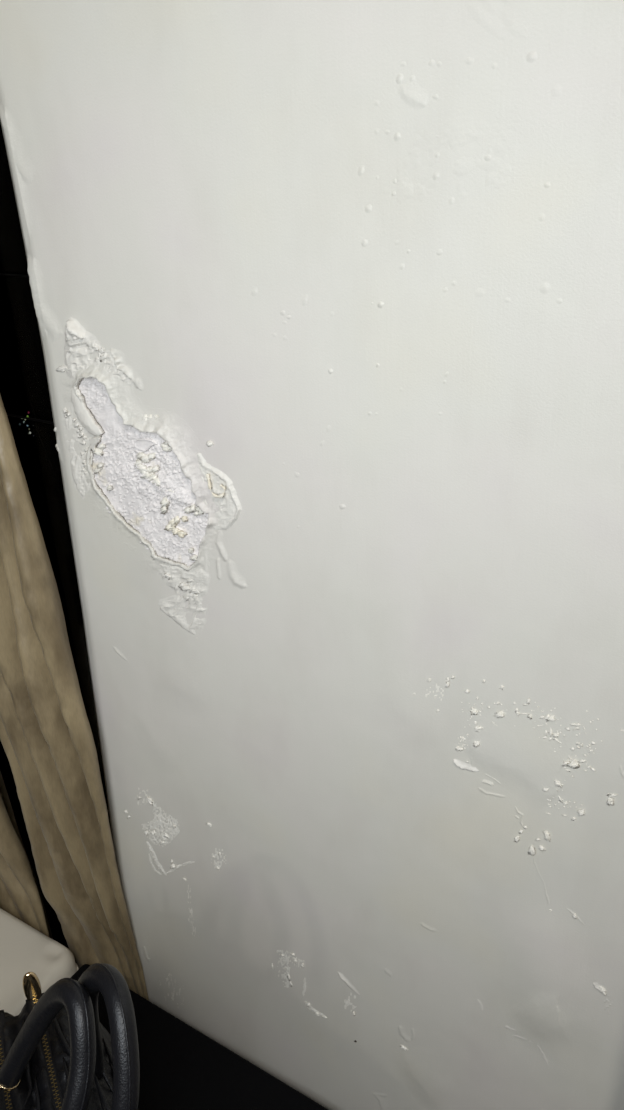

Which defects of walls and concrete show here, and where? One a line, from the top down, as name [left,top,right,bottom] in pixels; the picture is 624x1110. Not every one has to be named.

flaking render [54,354,242,639]